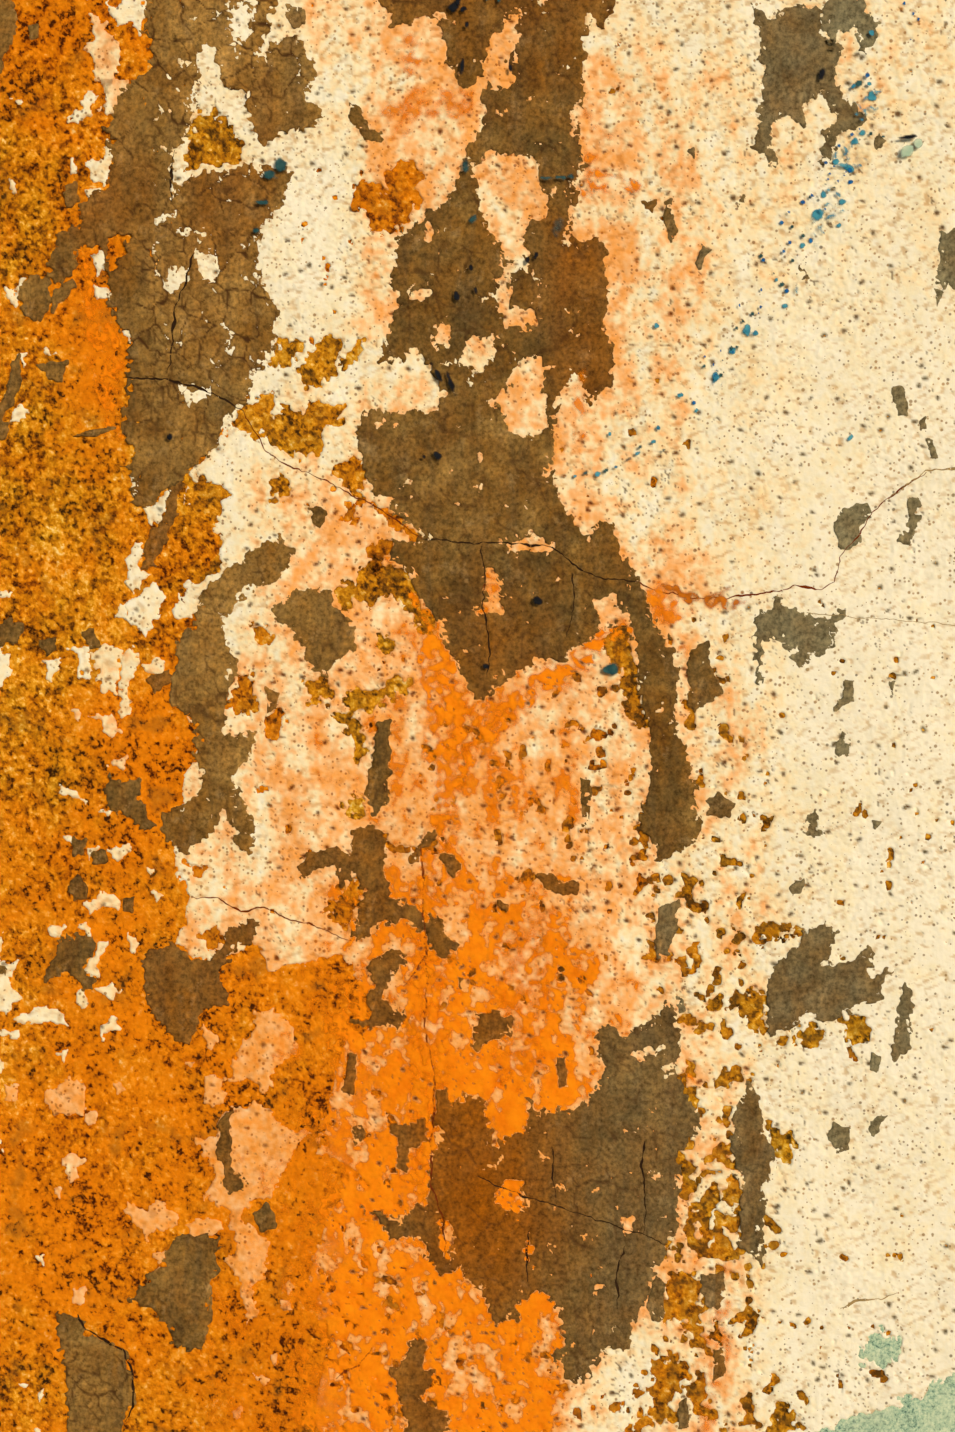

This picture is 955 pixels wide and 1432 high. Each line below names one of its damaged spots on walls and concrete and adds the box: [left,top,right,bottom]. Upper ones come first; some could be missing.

peeling [750,0,881,168]
crack [168,150,176,202]
corrosion [79,256,125,440]
crack [123,253,955,672]
flaking render [0,0,736,1432]
corrosion [647,581,740,624]
peeling [751,596,846,685]
corrosion [269,592,633,1432]
peeling [704,920,915,1073]
peeling [729,1080,799,1267]
peeling [757,1401,800,1432]
peeling [819,1372,955,1432]